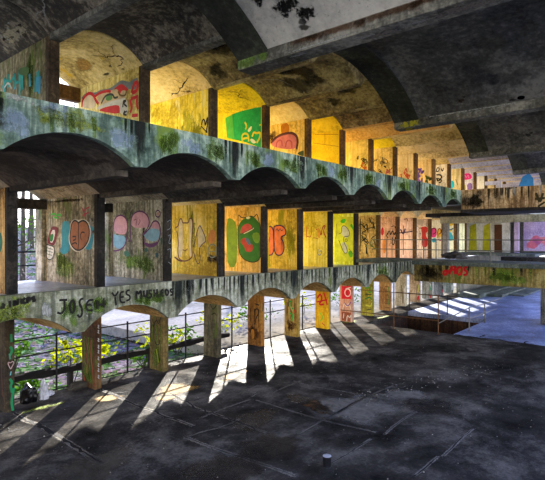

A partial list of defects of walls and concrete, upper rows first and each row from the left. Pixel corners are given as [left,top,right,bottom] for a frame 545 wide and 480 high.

damp [272,0,315,22]
damp [124,118,150,158]
damp [172,261,411,309]